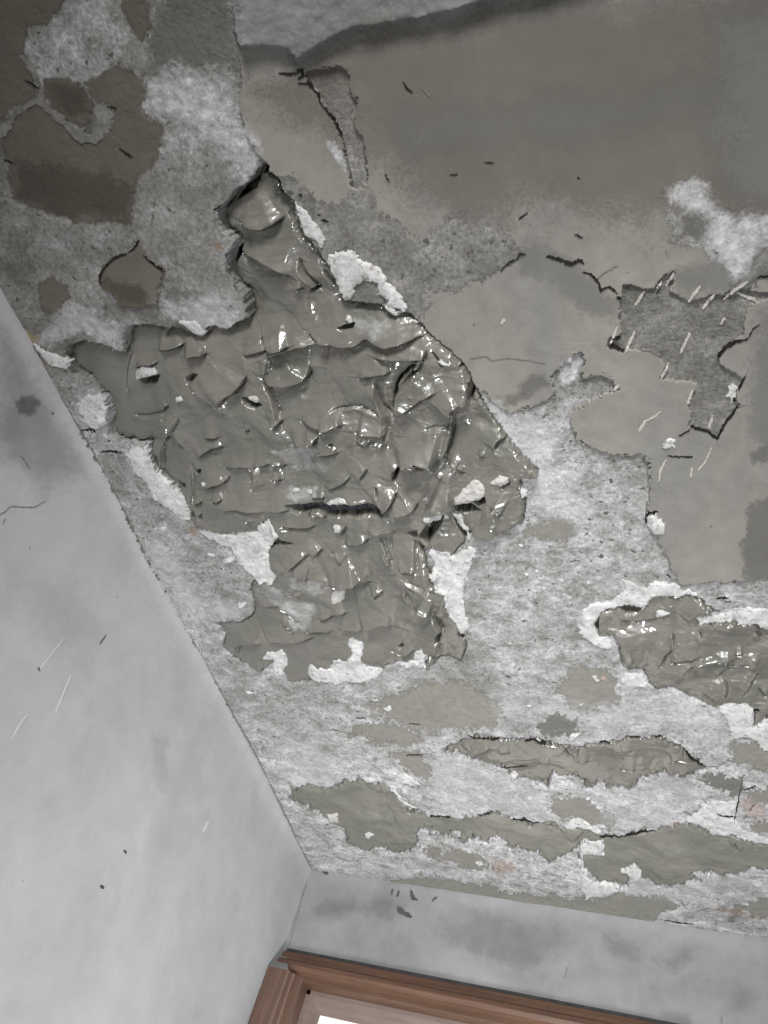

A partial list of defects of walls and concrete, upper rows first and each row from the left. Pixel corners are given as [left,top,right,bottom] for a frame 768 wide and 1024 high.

spalling [0,0,267,663]
damp [145,0,259,180]
crack [278,68,353,182]
spalling [271,65,524,319]
crack [501,234,622,300]
spalling [607,181,768,436]
crack [717,325,760,357]
spalling [206,352,768,939]
crack [469,734,499,742]
crack [501,738,552,769]